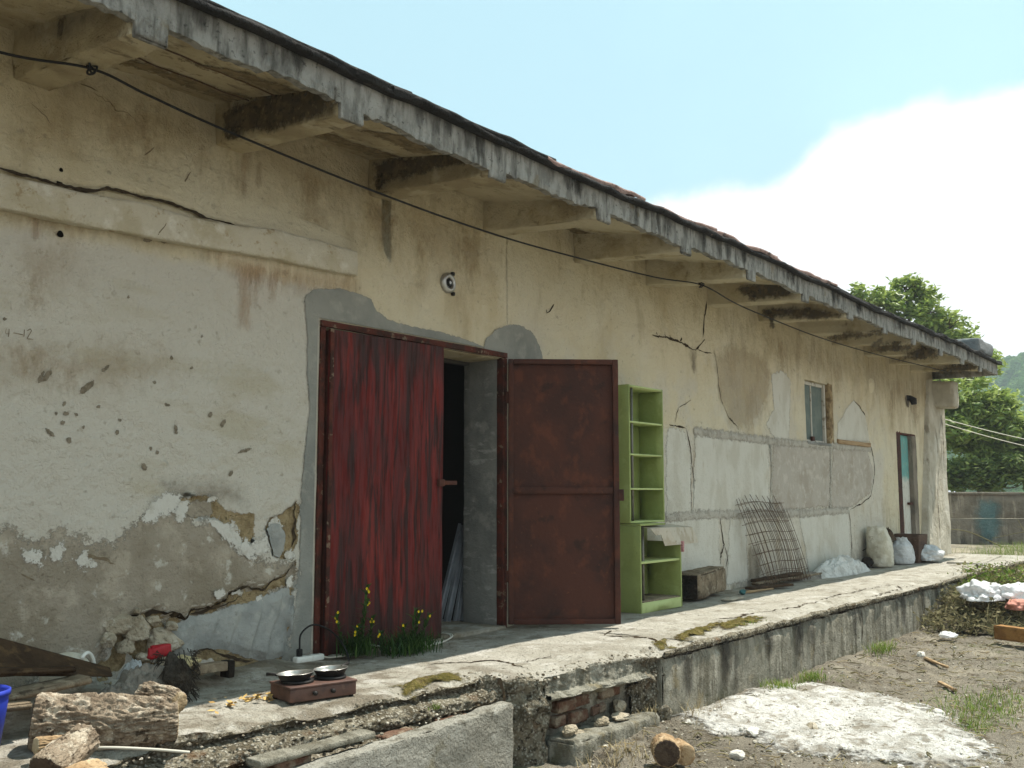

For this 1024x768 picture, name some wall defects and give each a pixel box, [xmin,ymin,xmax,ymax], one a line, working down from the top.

crack [653,302,738,428]
flaking render [665,371,851,585]
flaking render [837,400,869,442]
peeling [0,491,300,685]